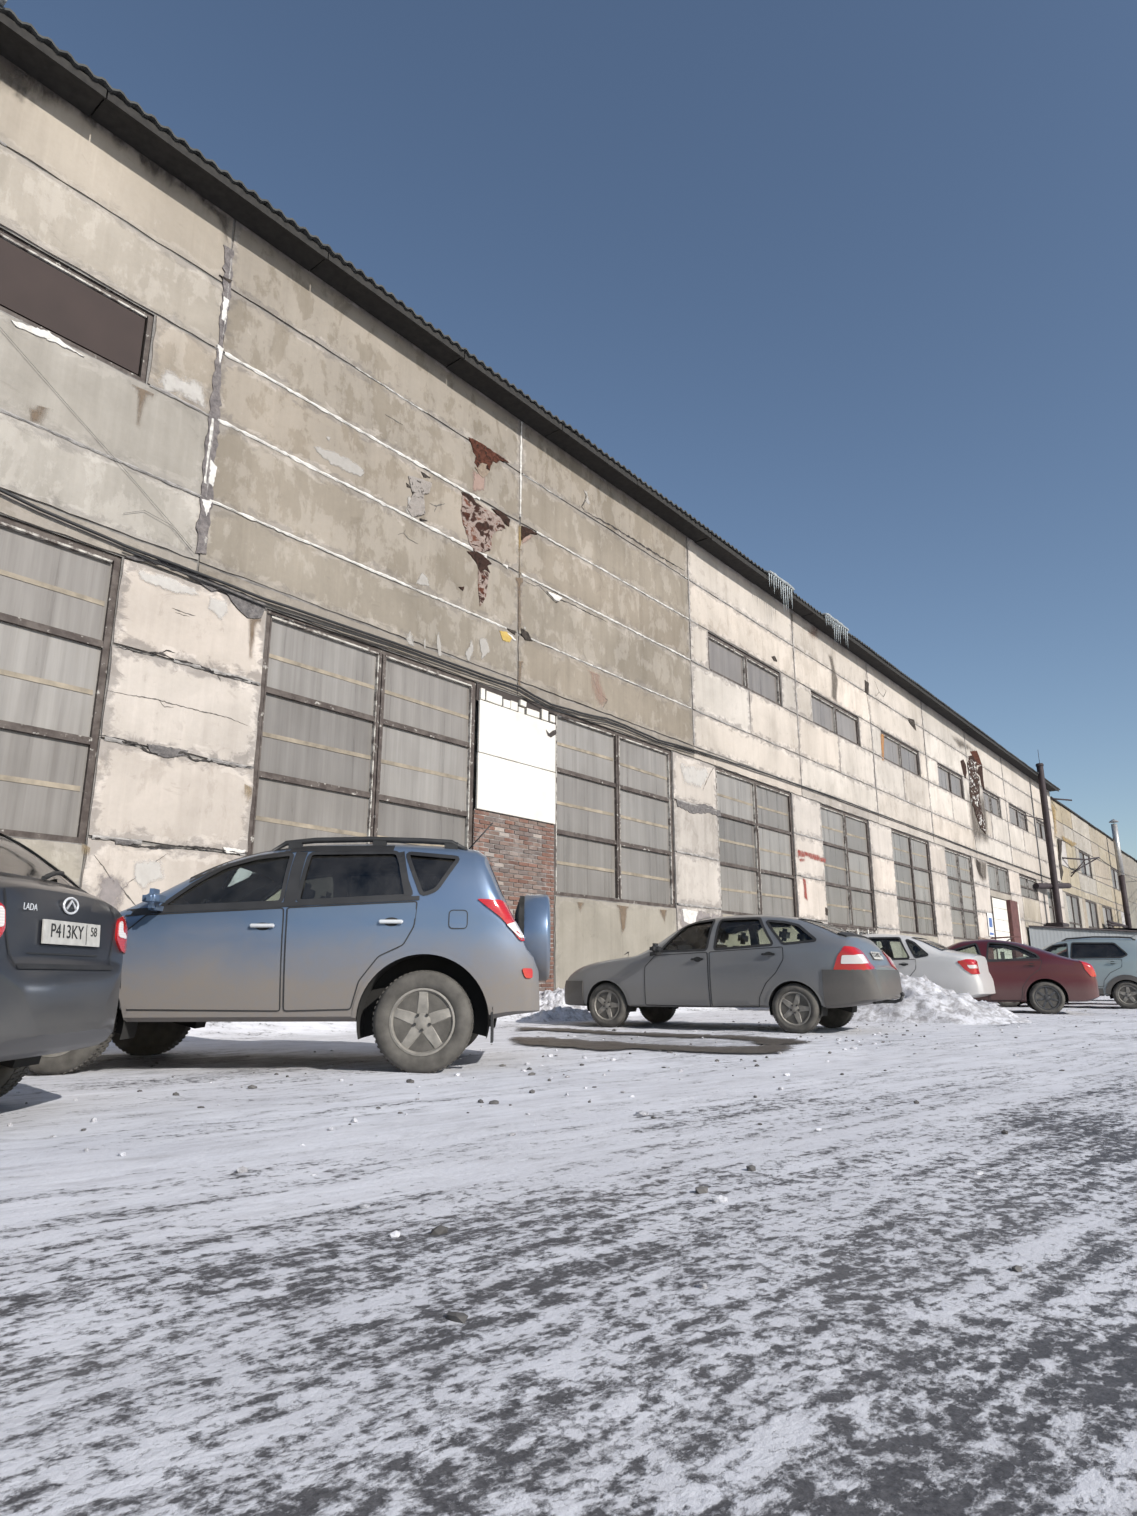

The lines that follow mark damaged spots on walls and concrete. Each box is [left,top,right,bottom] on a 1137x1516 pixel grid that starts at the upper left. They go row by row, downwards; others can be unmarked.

spalling [459,437,537,606]
spalling [960,750,987,840]
spalling [976,859,986,880]